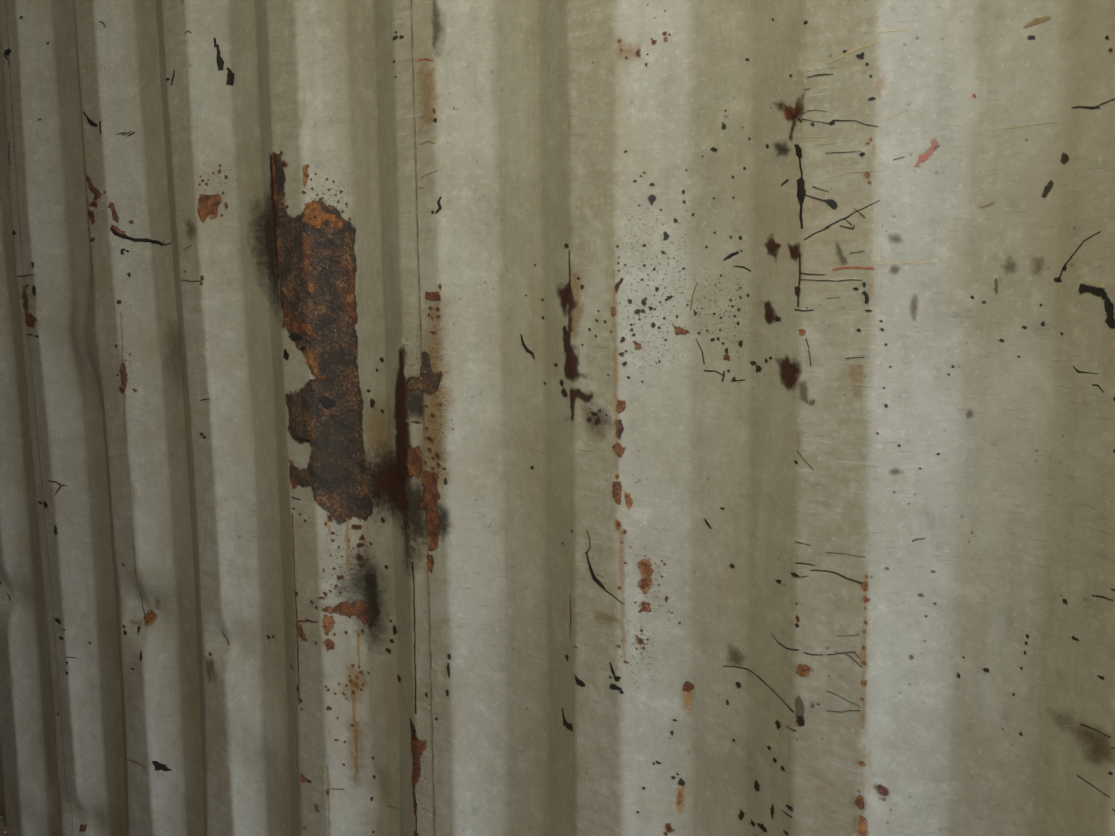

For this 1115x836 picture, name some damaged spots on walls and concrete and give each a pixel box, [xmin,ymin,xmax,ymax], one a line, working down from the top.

rust [197,164,231,223]
rust [588,171,814,405]
rust [554,263,626,457]
rust [271,151,454,836]
rust [612,474,633,508]
rust [751,802,793,836]
rust [855,790,868,836]
rust [876,785,889,802]